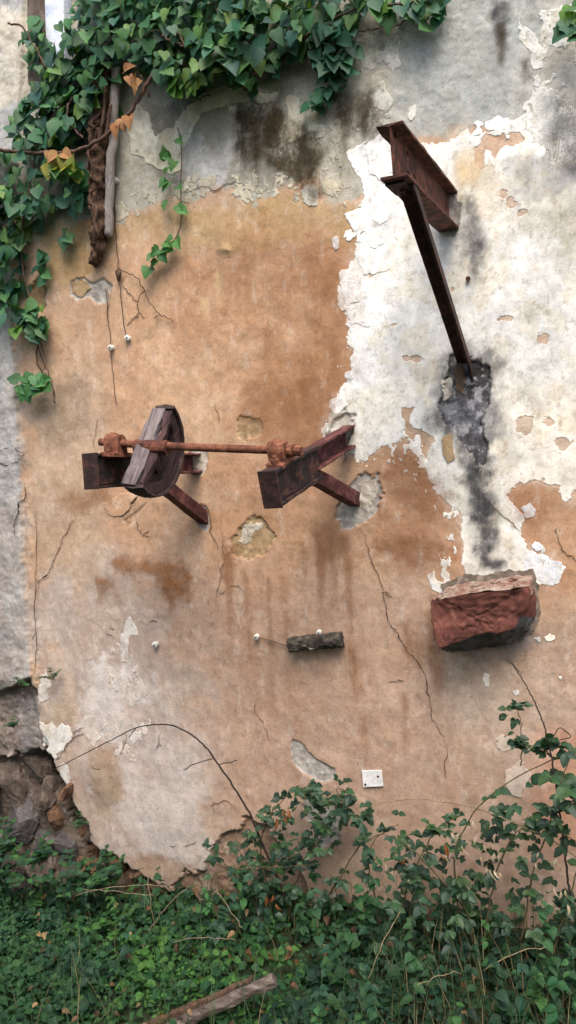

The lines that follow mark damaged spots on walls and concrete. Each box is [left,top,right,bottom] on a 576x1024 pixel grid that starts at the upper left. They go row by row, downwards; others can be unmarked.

leakage [235,102,322,183]
flaking render [70,278,113,304]
peeling [113,4,576,593]
leakage [435,396,505,569]
peeling [38,669,51,703]
crack [361,530,449,778]
peeling [39,721,72,785]
flaking render [290,740,335,783]